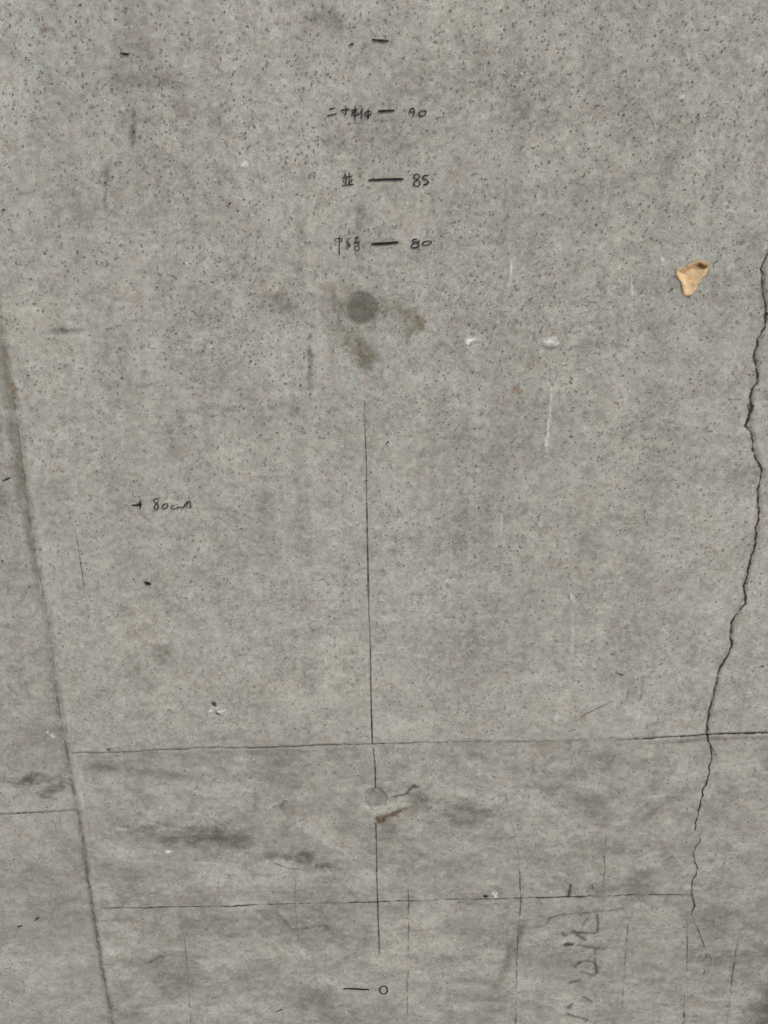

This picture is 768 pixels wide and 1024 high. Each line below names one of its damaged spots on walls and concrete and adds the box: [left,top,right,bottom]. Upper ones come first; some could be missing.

crack [687,253,768,973]